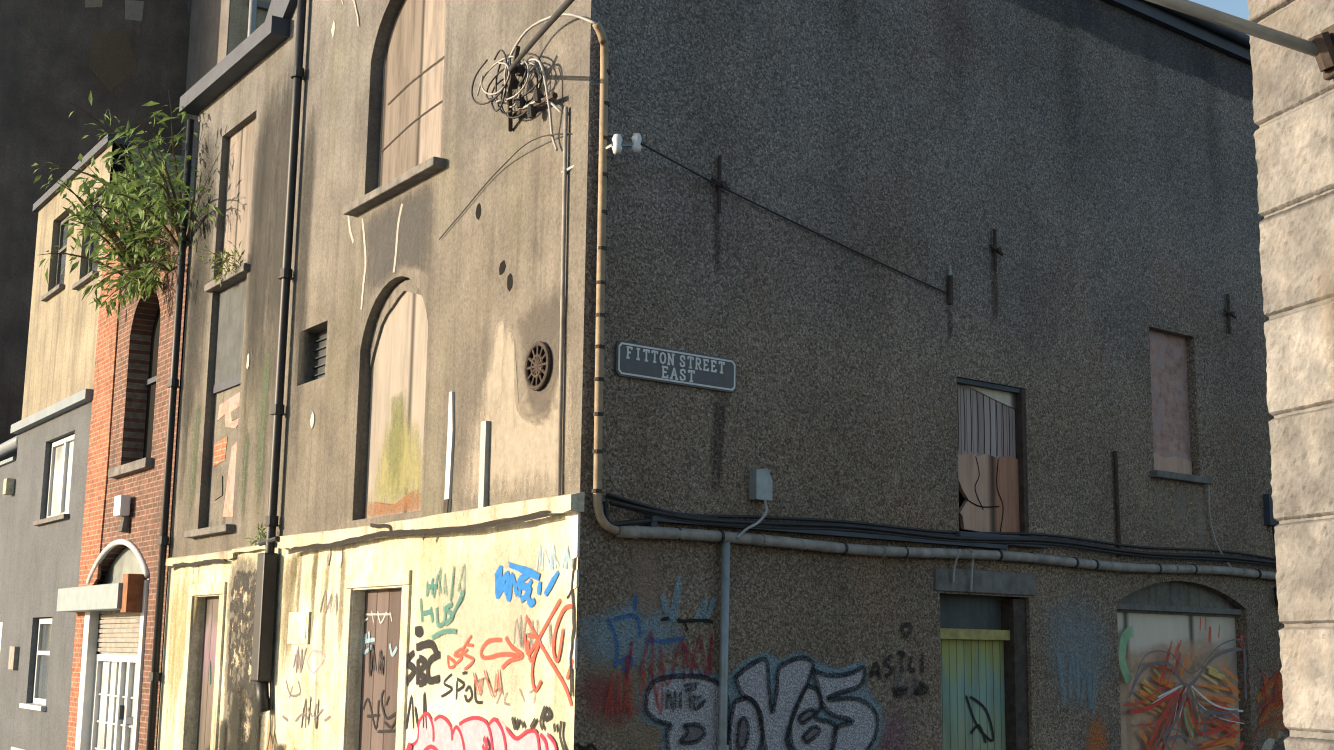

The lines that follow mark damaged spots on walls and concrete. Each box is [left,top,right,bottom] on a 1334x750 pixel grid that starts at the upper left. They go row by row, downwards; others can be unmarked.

damp [209,682,259,750]